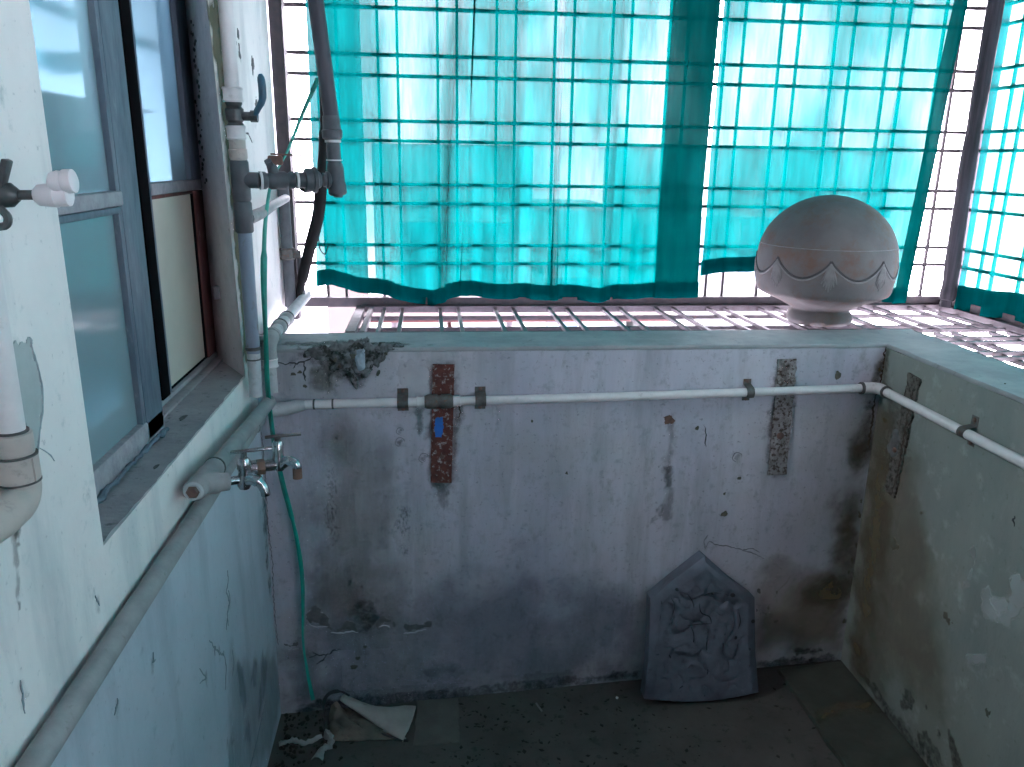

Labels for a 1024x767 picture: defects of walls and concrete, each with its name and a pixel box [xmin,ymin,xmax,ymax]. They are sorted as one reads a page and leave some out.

peeling [13,337,44,450]
spalling [303,337,404,389]
water stain [873,354,888,382]
water stain [756,411,958,766]